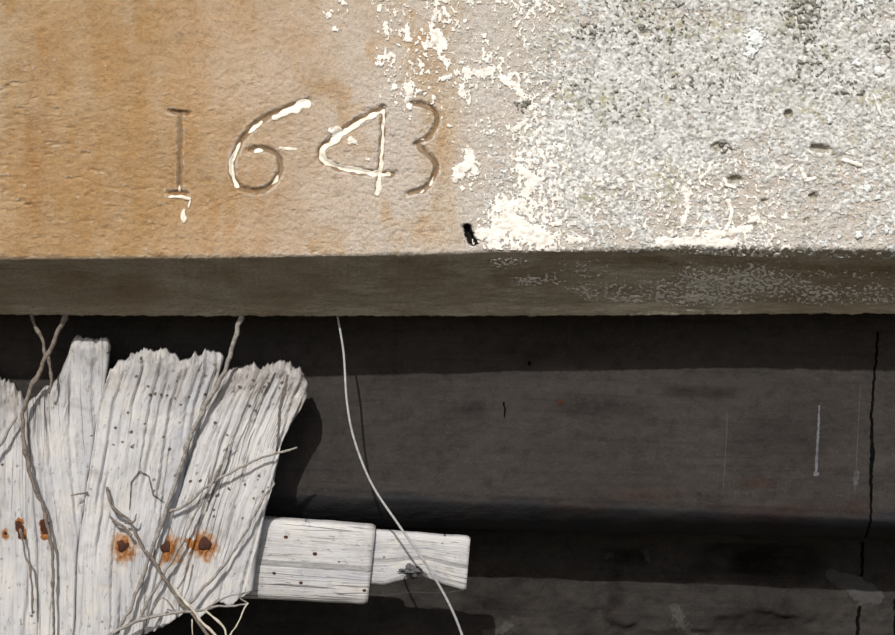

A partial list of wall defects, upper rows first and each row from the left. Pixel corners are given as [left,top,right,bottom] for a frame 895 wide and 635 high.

peeling [318,0,348,32]
peeling [328,127,358,145]
peeling [368,0,829,266]
peeling [518,276,557,286]
crack [860,332,879,577]
crack [854,605,862,635]